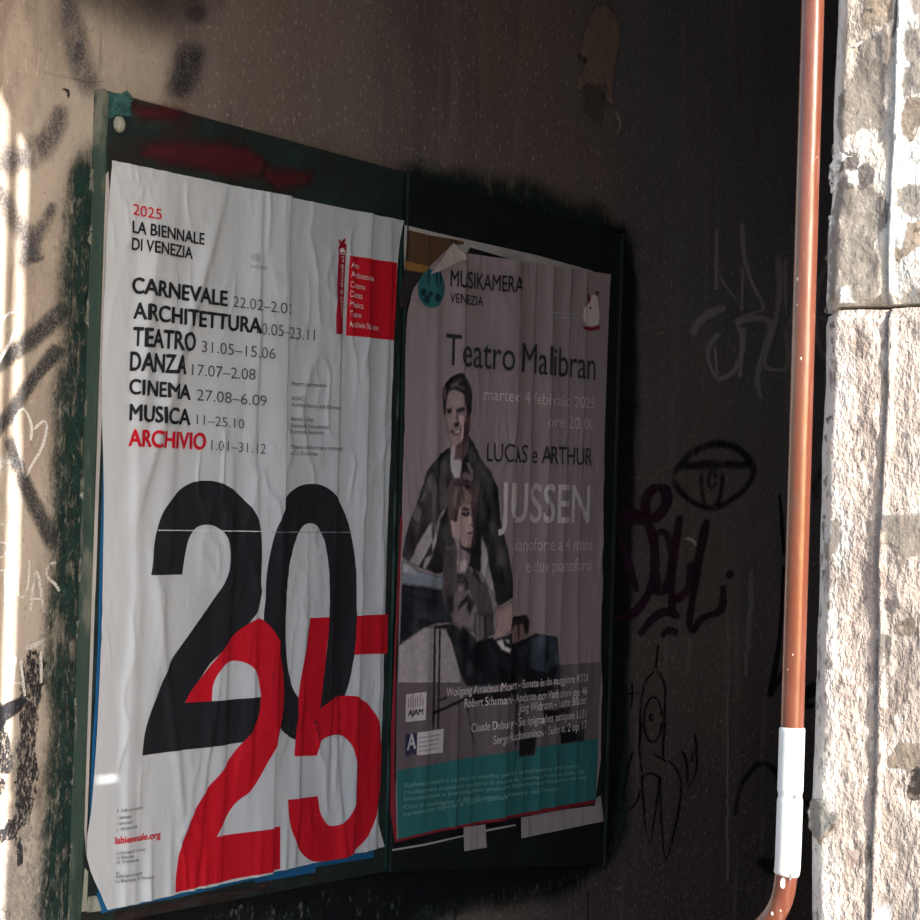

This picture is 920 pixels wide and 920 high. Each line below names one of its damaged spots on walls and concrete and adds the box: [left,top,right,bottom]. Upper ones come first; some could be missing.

peeling [825,0,920,366]
spalling [820,515,843,586]